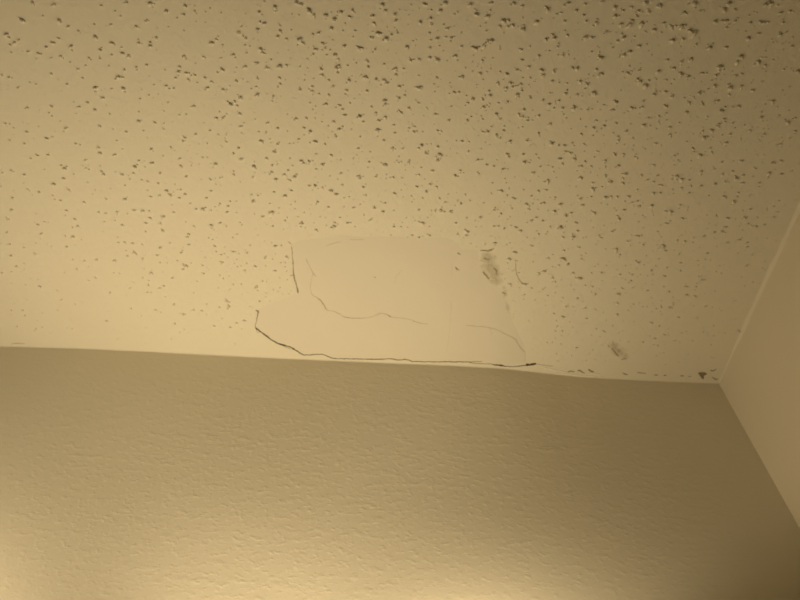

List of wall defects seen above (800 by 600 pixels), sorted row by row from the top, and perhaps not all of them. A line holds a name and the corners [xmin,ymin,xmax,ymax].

crack [289,242,424,324]
crack [255,310,548,367]